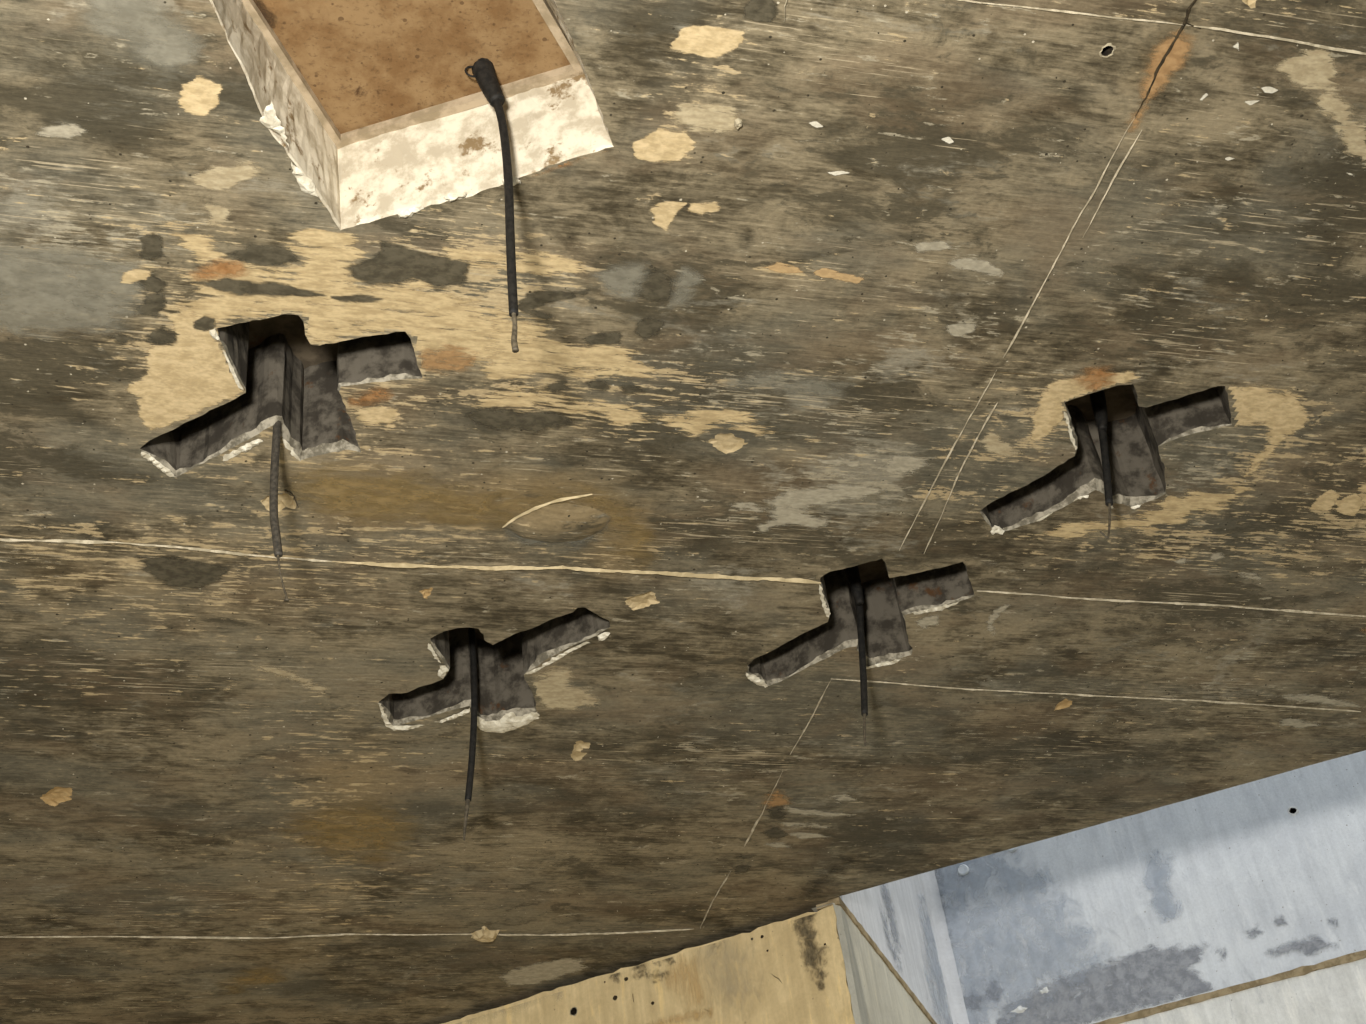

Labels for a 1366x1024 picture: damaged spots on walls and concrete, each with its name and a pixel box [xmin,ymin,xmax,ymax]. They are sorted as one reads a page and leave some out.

spalling [259,101,318,197]
crack [995,0,1201,376]
corrosion [1132,32,1191,129]
peeling [1276,48,1366,168]
peeling [127,160,774,454]
spalling [141,452,177,478]
spalling [223,439,263,461]
peeling [979,371,1141,457]
peeling [1037,386,1309,542]
peeling [378,632,610,733]
spalling [746,673,768,688]
leakage [924,854,1212,1024]